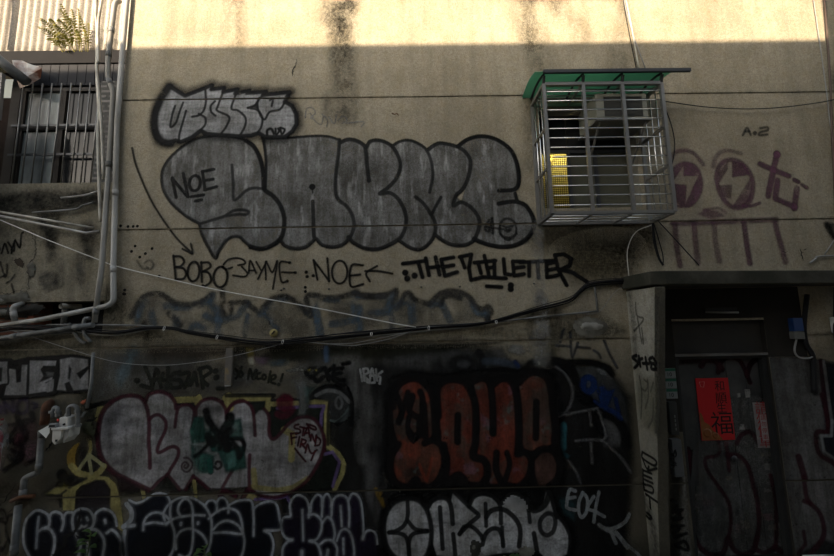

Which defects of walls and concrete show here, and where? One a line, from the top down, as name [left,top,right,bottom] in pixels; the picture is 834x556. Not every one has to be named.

damp [332,1,356,72]